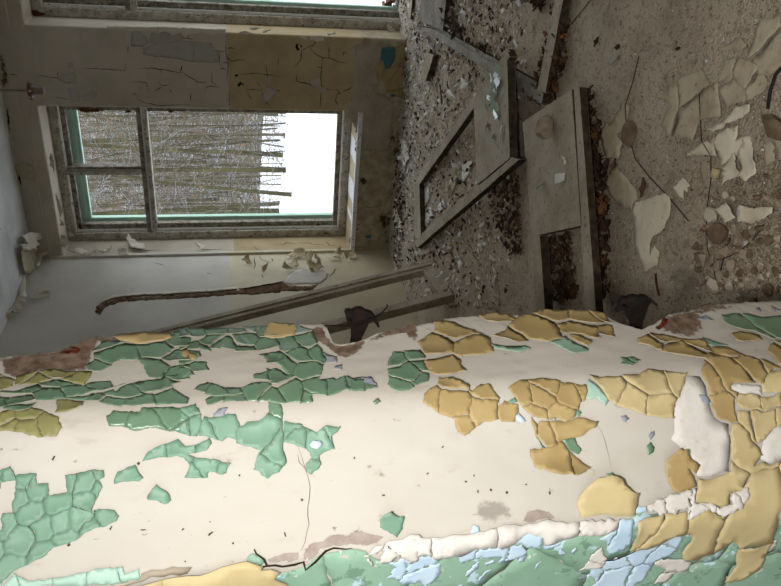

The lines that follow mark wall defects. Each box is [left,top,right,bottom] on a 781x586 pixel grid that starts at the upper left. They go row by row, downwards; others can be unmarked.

peeling [107,26,226,46]
crack [45,32,352,107]
flaking render [348,43,406,151]
peeling [6,232,50,320]
peeling [67,234,145,257]
peeling [96,238,358,308]
peeling [0,304,781,586]